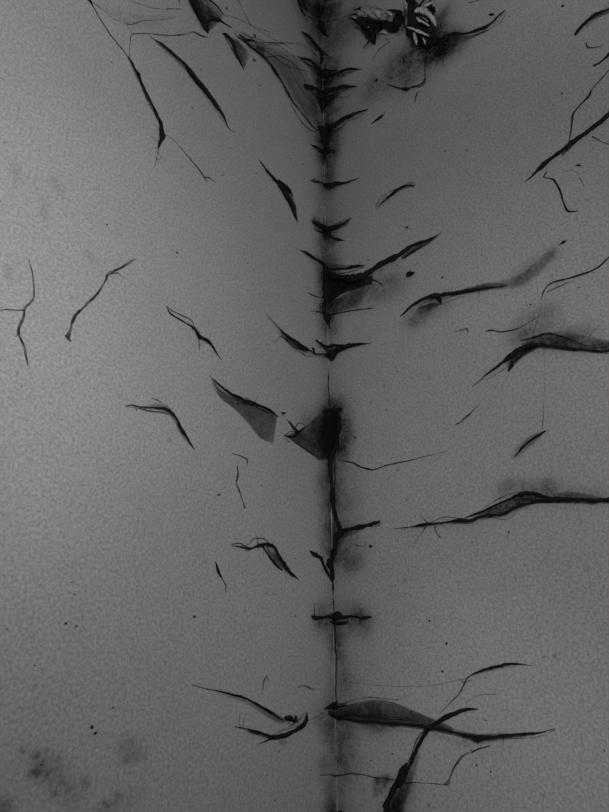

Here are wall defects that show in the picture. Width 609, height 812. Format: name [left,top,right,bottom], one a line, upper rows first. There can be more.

crack [0,267,35,365]
crack [65,265,124,341]
crack [331,563,339,699]
crack [332,745,490,785]